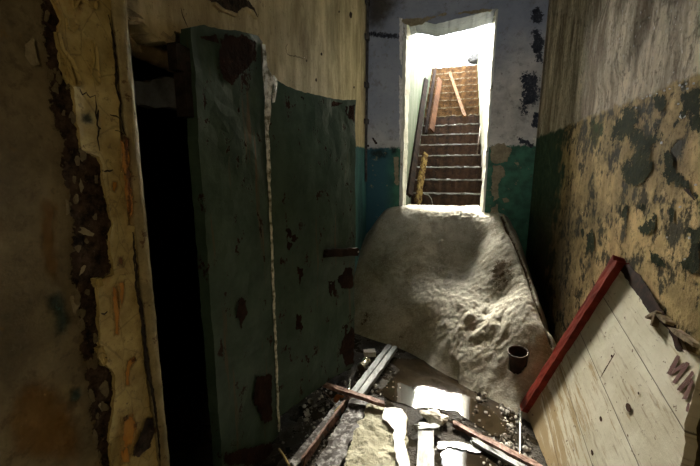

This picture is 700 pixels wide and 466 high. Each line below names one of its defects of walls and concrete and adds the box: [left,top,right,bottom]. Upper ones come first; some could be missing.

peeling [25,0,158,466]
crack [80,15,126,151]
peeling [490,143,512,213]
peeling [589,82,700,187]